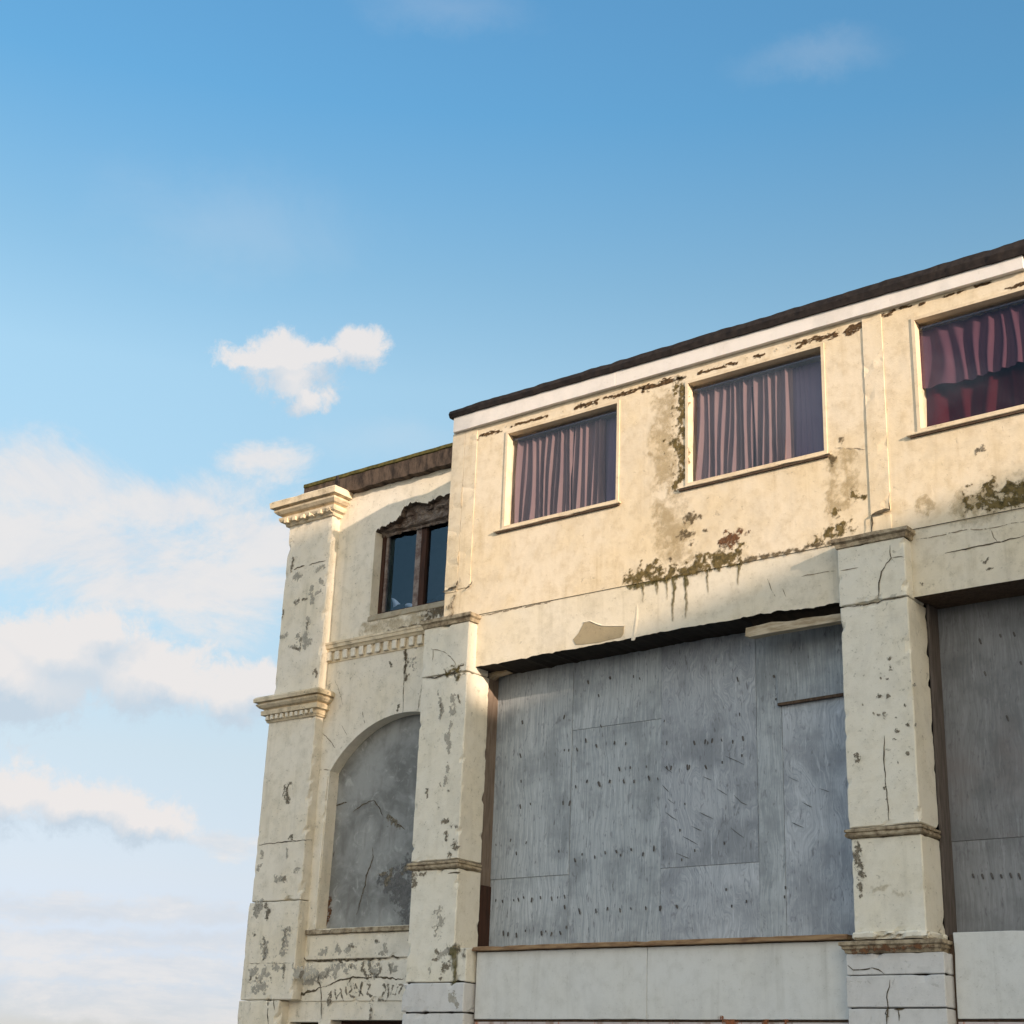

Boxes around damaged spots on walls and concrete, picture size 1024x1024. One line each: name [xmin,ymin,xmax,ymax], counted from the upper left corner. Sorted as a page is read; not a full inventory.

peeling [562,322,862,413]
peeling [477,414,548,441]
damp [663,375,691,491]
peeling [280,557,325,651]
damp [623,507,854,614]
crack [849,551,906,607]
crack [920,522,1023,553]
damp [962,475,1024,512]
peeling [437,691,460,791]
peeling [248,926,404,1020]
crack [250,955,403,1018]
crack [849,966,905,1024]